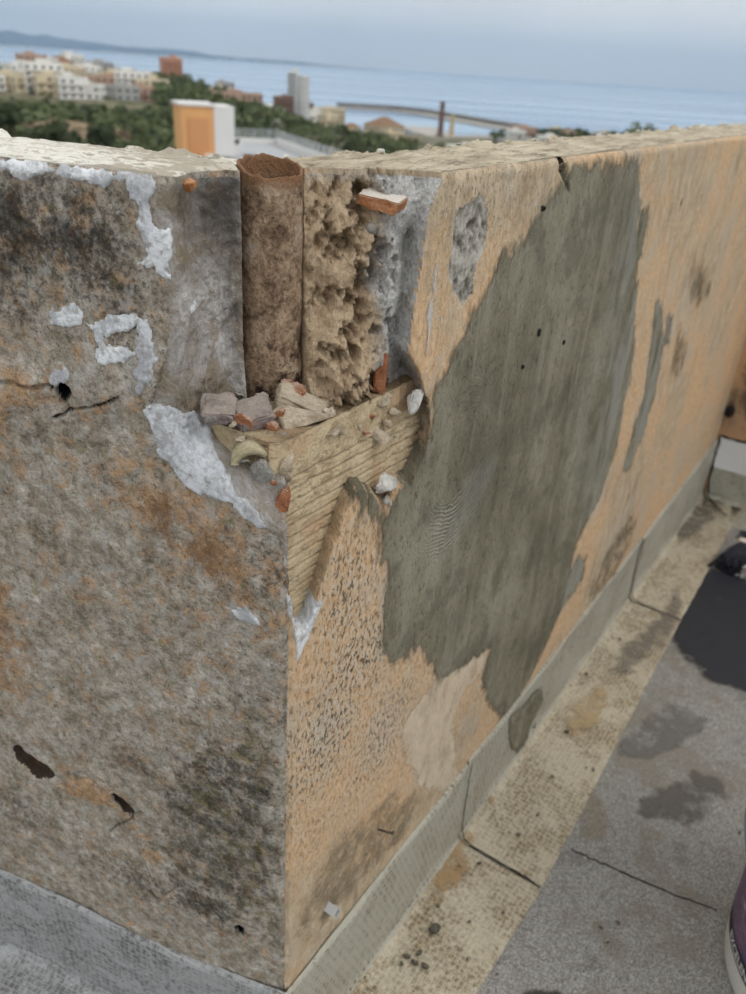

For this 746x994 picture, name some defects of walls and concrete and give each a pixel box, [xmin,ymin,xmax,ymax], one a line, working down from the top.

flaking render [448,195,488,306]
spalling [0,158,288,574]
spalling [301,173,443,451]
spalling [309,472,404,599]
peeling [231,605,260,626]
spalling [13,745,55,779]
flaking render [66,778,134,816]